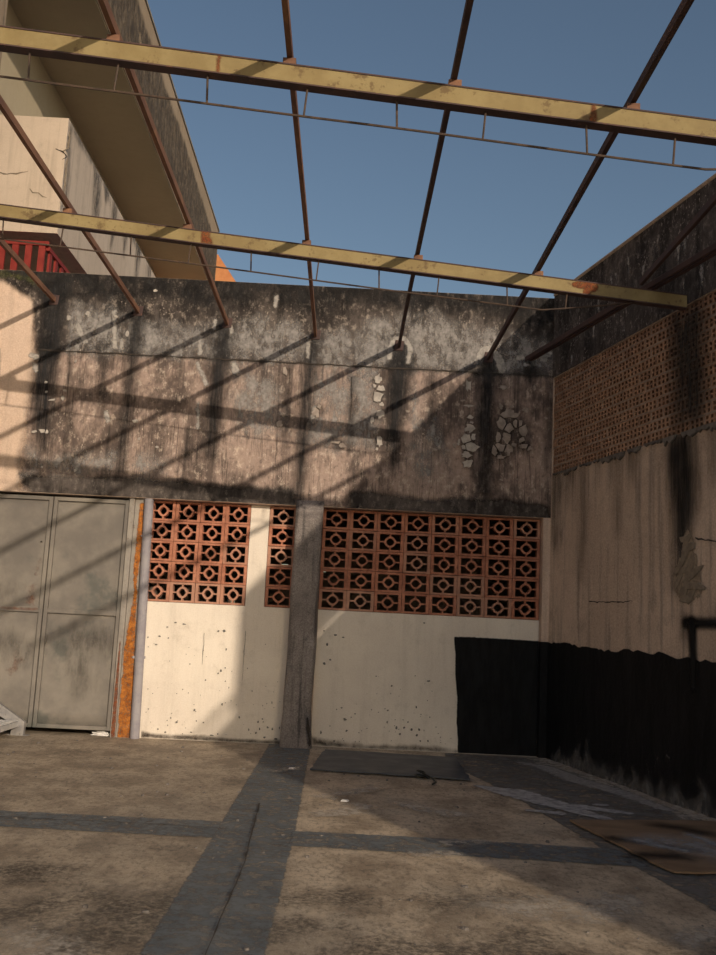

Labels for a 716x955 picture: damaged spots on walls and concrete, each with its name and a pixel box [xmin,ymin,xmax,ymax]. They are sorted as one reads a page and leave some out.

damp [108,0,151,45]
damp [69,131,116,219]
damp [134,69,211,231]
corrosion [572,282,598,294]
damp [0,178,716,518]
peeling [370,373,385,424]
peeling [433,379,480,468]
peeling [492,403,533,459]
damp [670,435,696,564]
corrosion [111,503,144,738]